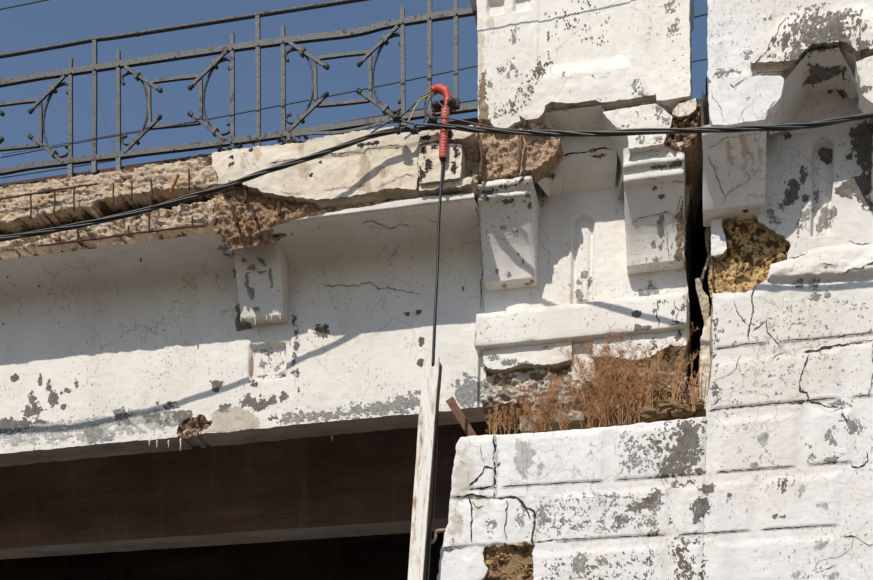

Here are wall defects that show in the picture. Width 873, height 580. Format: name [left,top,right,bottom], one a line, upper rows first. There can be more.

peeling [544,0,613,45]
peeling [741,2,873,99]
spalling [0,155,407,311]
peeling [0,315,421,450]
crack [322,282,419,294]
peeling [419,134,438,182]
spalling [448,51,570,209]
spalling [708,122,873,297]
crack [709,287,873,422]
peeling [483,418,716,580]
crack [445,435,873,572]